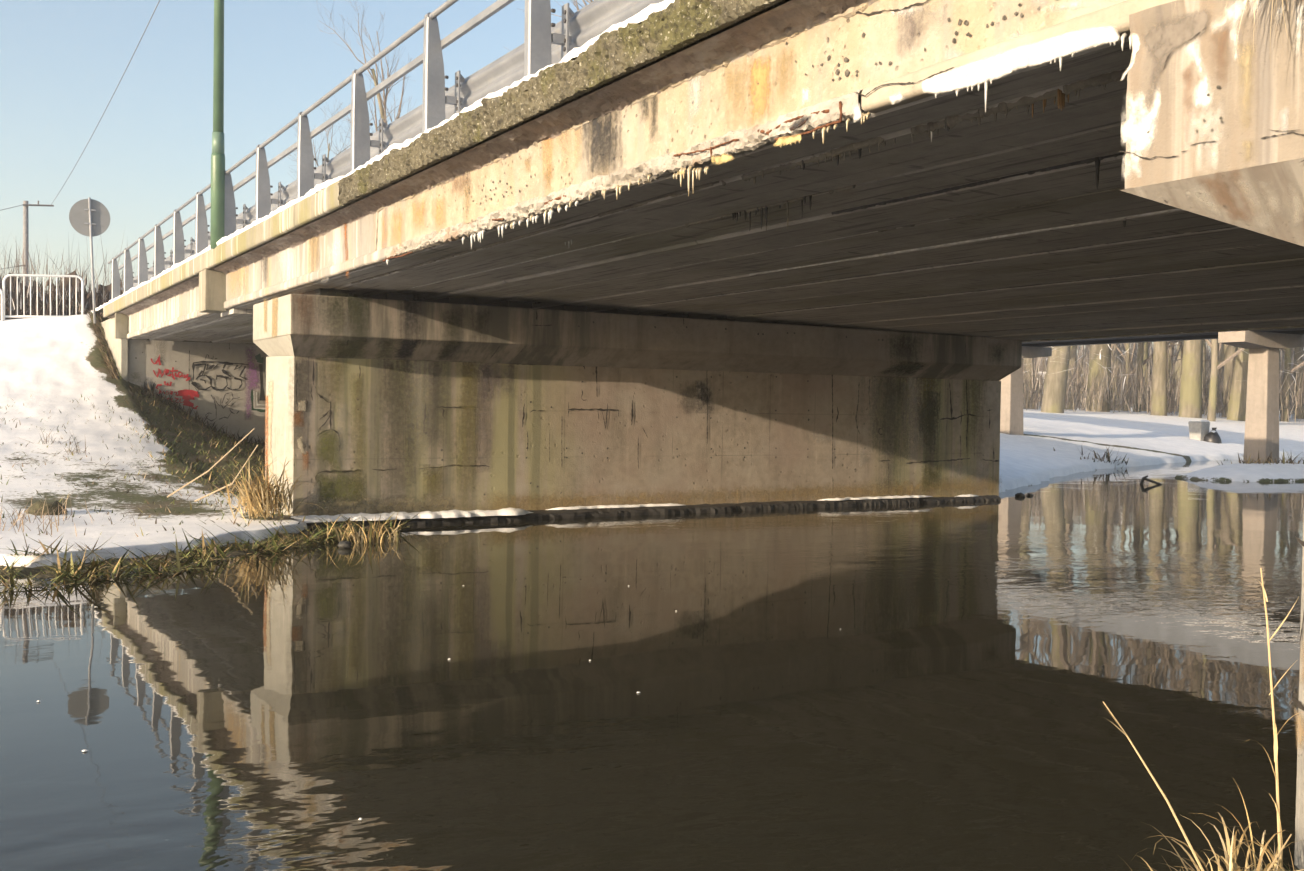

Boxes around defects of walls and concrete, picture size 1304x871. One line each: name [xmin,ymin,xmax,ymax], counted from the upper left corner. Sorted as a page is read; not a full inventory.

crack [856,0,928,16]
corrosion [750,60,770,117]
water stain [741,26,1140,184]
spalling [1144,10,1209,104]
water stain [1187,40,1211,106]
water stain [584,112,618,171]
spalling [376,55,862,262]
water stain [712,154,732,163]
water stain [831,90,1160,215]
crack [1119,141,1217,160]
water stain [295,360,308,422]
water stain [309,467,451,515]